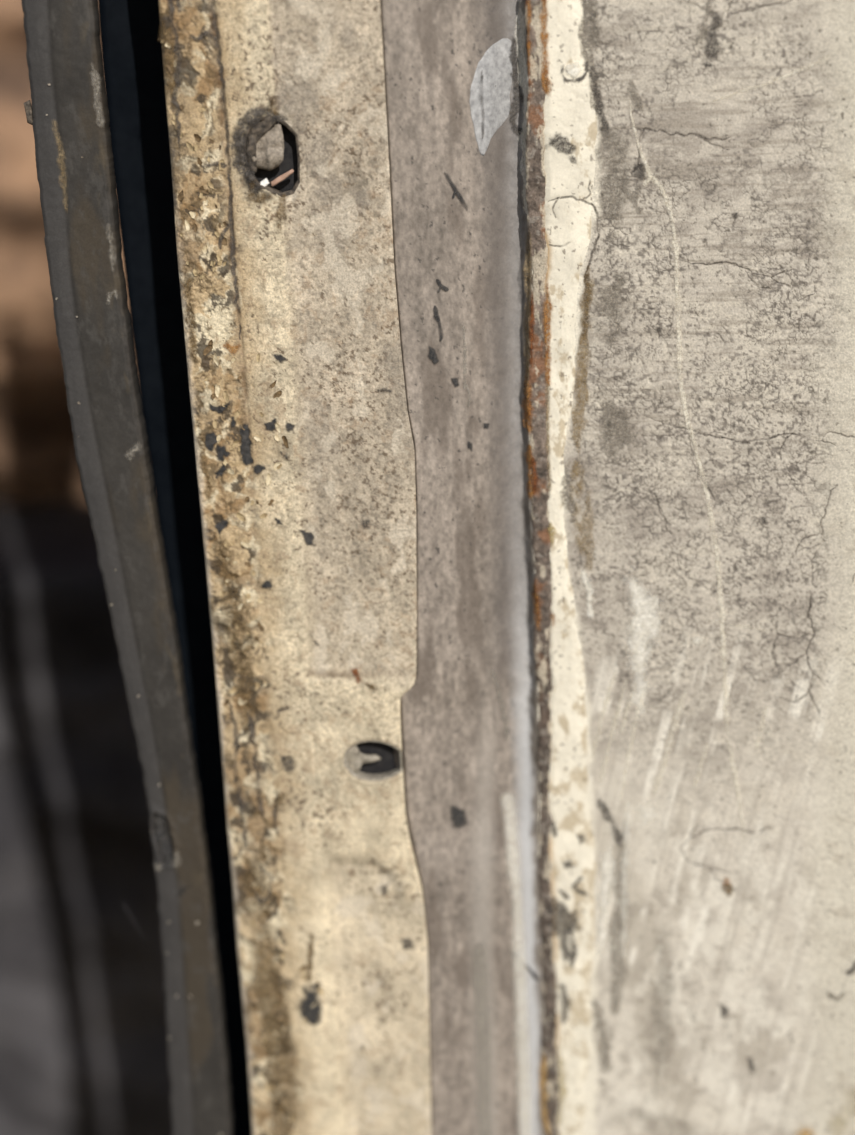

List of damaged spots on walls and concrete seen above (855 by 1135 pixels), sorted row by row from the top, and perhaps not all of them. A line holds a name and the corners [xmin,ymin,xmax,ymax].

corrosion [526,0,550,93]
crack [630,128,729,180]
corrosion [522,235,552,497]
corrosion [540,1056,565,1135]